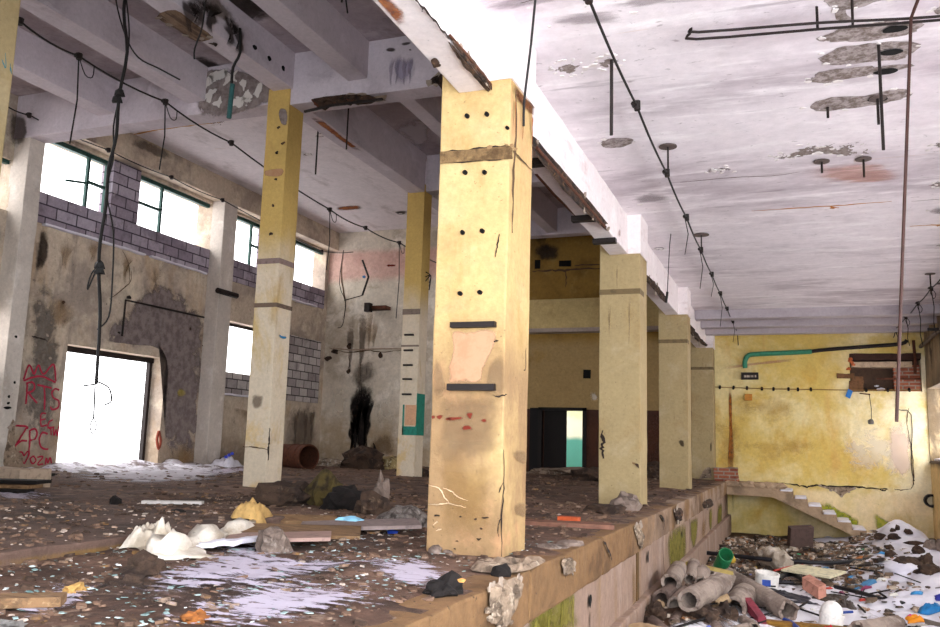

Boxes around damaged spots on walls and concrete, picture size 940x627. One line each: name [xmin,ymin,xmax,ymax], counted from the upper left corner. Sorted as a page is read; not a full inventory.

corrosion [378,0,403,22]
spalling [449,34,492,92]
peeling [198,68,271,126]
spalling [304,92,387,113]
peeling [768,143,874,161]
flaking render [449,330,495,383]
water stain [348,397,374,449]
crack [785,408,915,491]